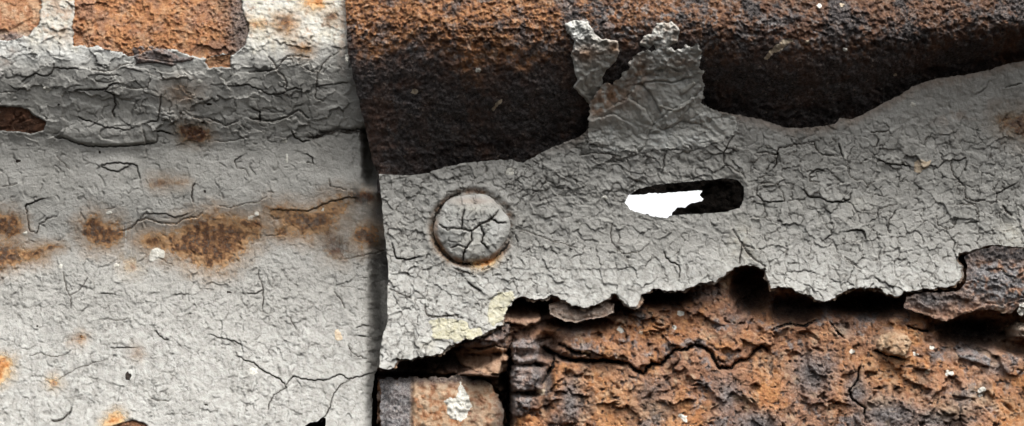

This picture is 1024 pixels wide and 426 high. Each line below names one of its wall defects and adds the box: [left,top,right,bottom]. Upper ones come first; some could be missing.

crack [5,64,170,176]
crack [194,53,366,212]
peeling [565,20,738,154]
crack [723,131,908,238]
rust [0,212,63,271]
rust [79,213,126,249]
rust [141,189,379,270]
crack [440,211,569,290]
peeling [429,291,515,342]
peeling [549,300,614,323]
crack [216,325,367,418]
peeling [444,382,472,422]